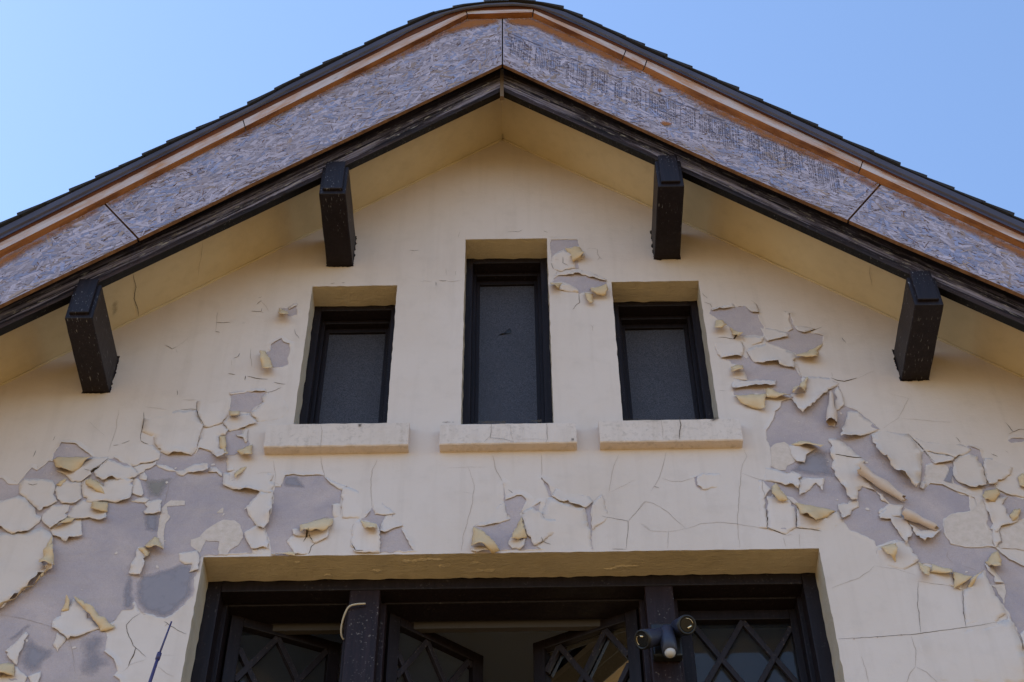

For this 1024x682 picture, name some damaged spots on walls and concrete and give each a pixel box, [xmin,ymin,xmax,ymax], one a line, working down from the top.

peeling [547,236,608,303]
peeling [260,335,295,370]
peeling [0,387,419,682]
peeling [470,474,608,573]
crack [609,453,820,546]
peeling [708,303,1024,682]
crack [845,566,994,681]